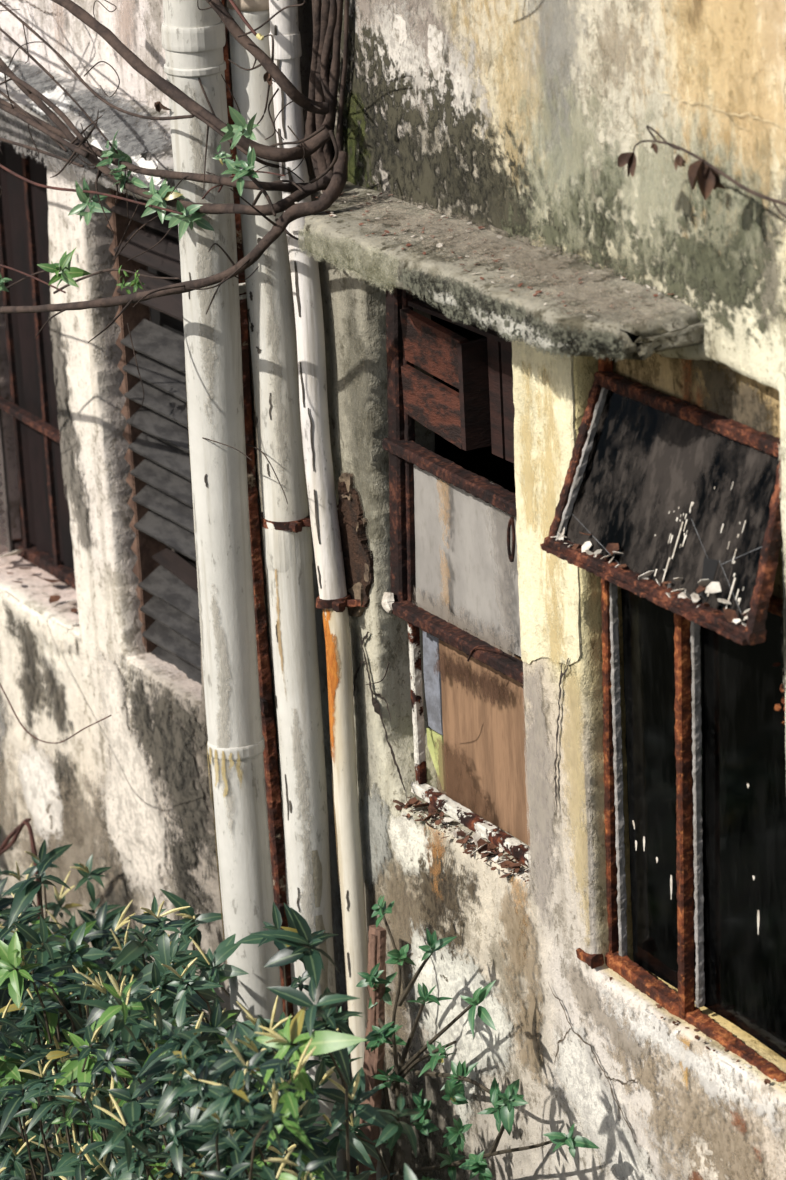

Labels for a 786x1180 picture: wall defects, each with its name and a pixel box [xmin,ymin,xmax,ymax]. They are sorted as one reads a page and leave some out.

damp [328,0,553,245]
damp [556,144,627,276]
damp [428,290,459,308]
spalling [337,472,374,617]
rust [437,477,450,608]
damp [2,593,80,846]
rust [275,570,283,671]
rust [323,609,341,759]
crack [554,658,569,814]
rust [426,826,445,893]
damp [378,844,480,1180]
crack [548,982,642,1154]